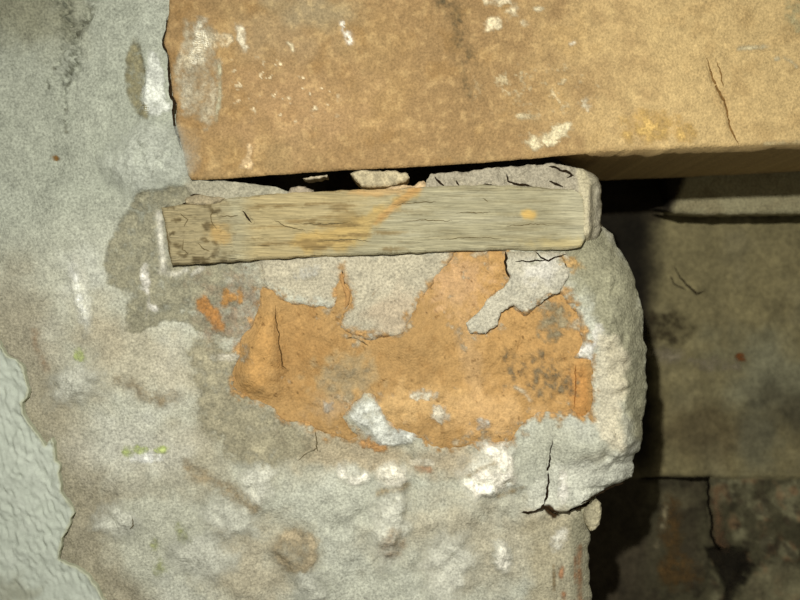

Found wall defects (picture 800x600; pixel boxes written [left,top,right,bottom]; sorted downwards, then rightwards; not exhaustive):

crack [706,58,739,144]
crack [515,251,567,267]
spalling [197,289,243,330]
spalling [230,250,595,452]
crack [522,442,553,514]